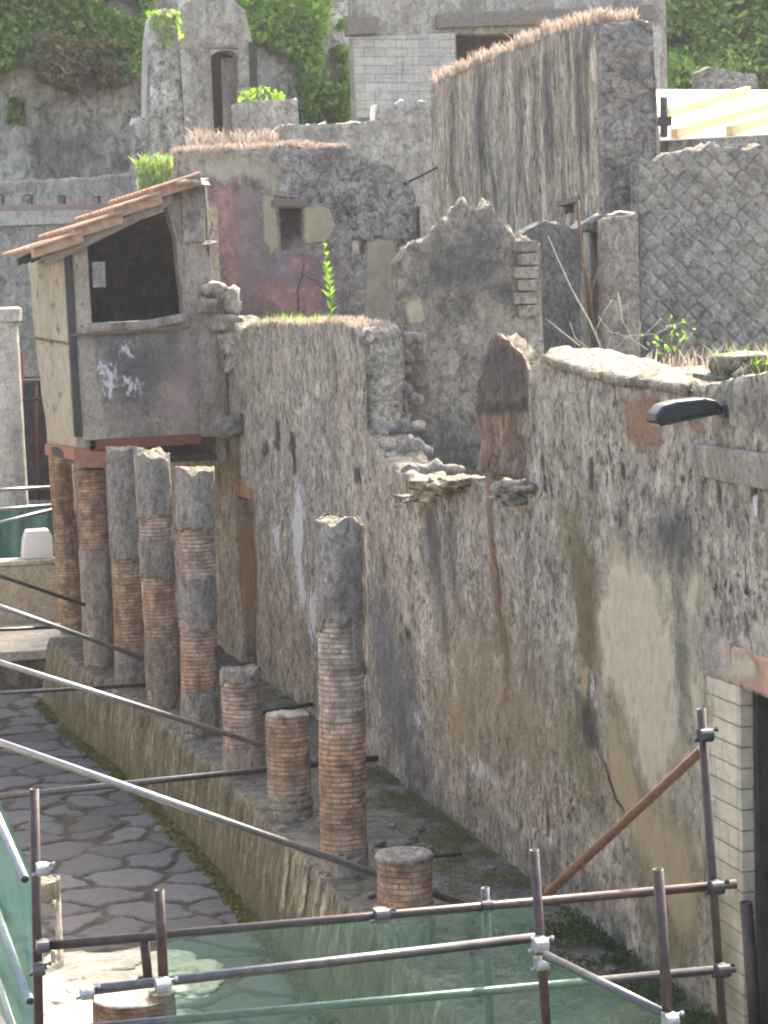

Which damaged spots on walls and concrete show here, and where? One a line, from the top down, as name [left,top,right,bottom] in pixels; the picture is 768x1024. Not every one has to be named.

flaking render [92,360,150,399]
crack [596,744,625,812]